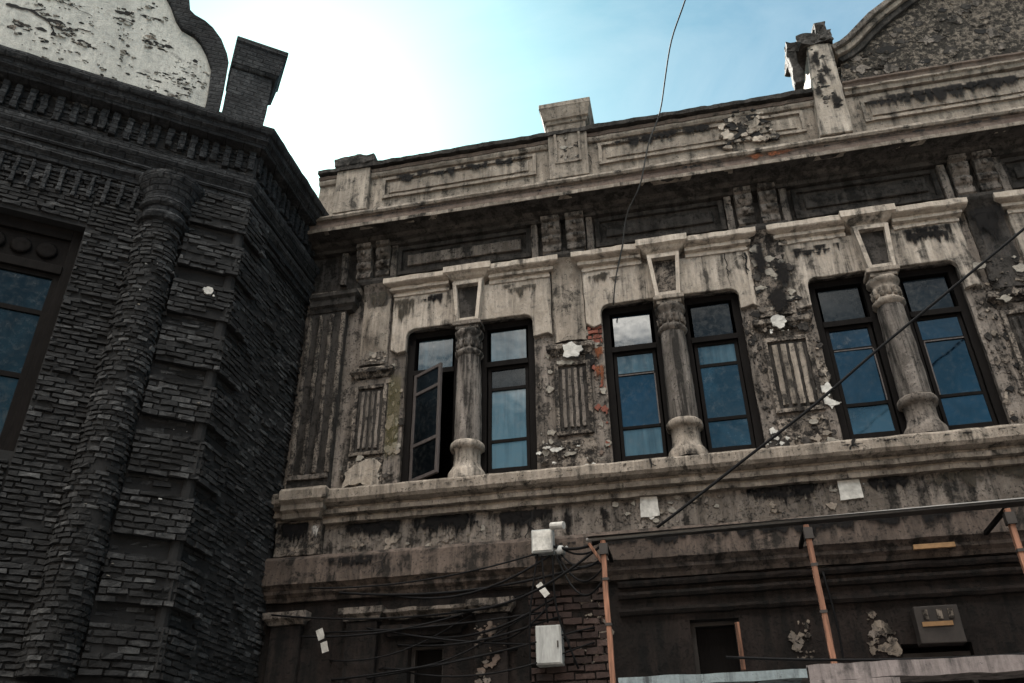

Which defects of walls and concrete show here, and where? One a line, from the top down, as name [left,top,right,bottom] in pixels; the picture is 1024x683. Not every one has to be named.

spalling [7,0,210,99]
leakage [811,51,841,104]
spalling [718,106,780,150]
leakage [397,156,521,182]
spalling [742,239,842,448]
peeling [970,255,1024,422]
peeling [339,363,404,488]
peeling [536,429,612,466]
leakage [347,513,478,538]
leakage [494,509,576,545]
leakage [328,555,377,566]
peeling [867,611,902,657]